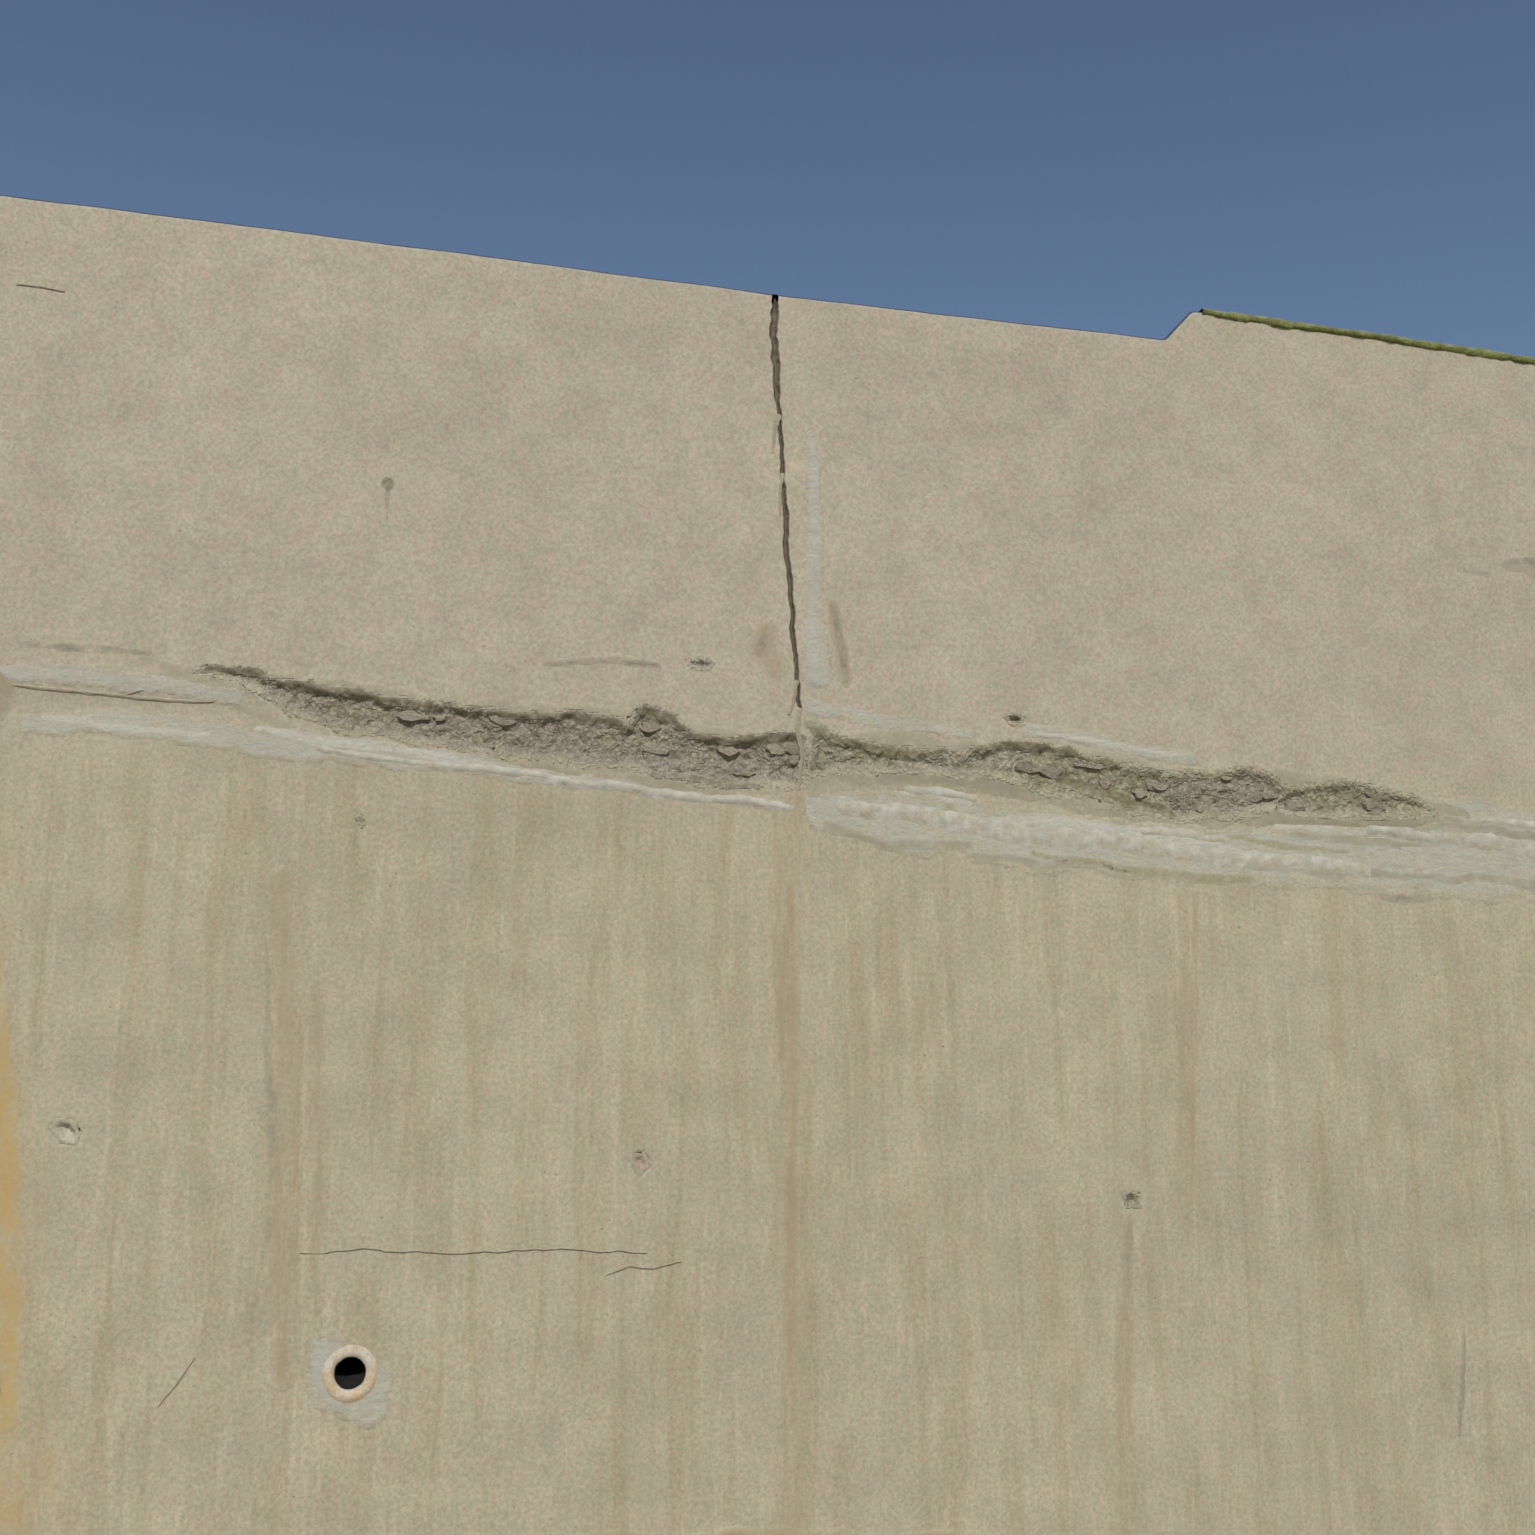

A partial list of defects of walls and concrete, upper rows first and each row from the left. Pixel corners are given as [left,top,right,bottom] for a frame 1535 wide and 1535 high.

crack [16,284,64,292]
crack [769,298,805,790]
spalling [192,663,1440,824]
water stain [0,639,1535,1535]